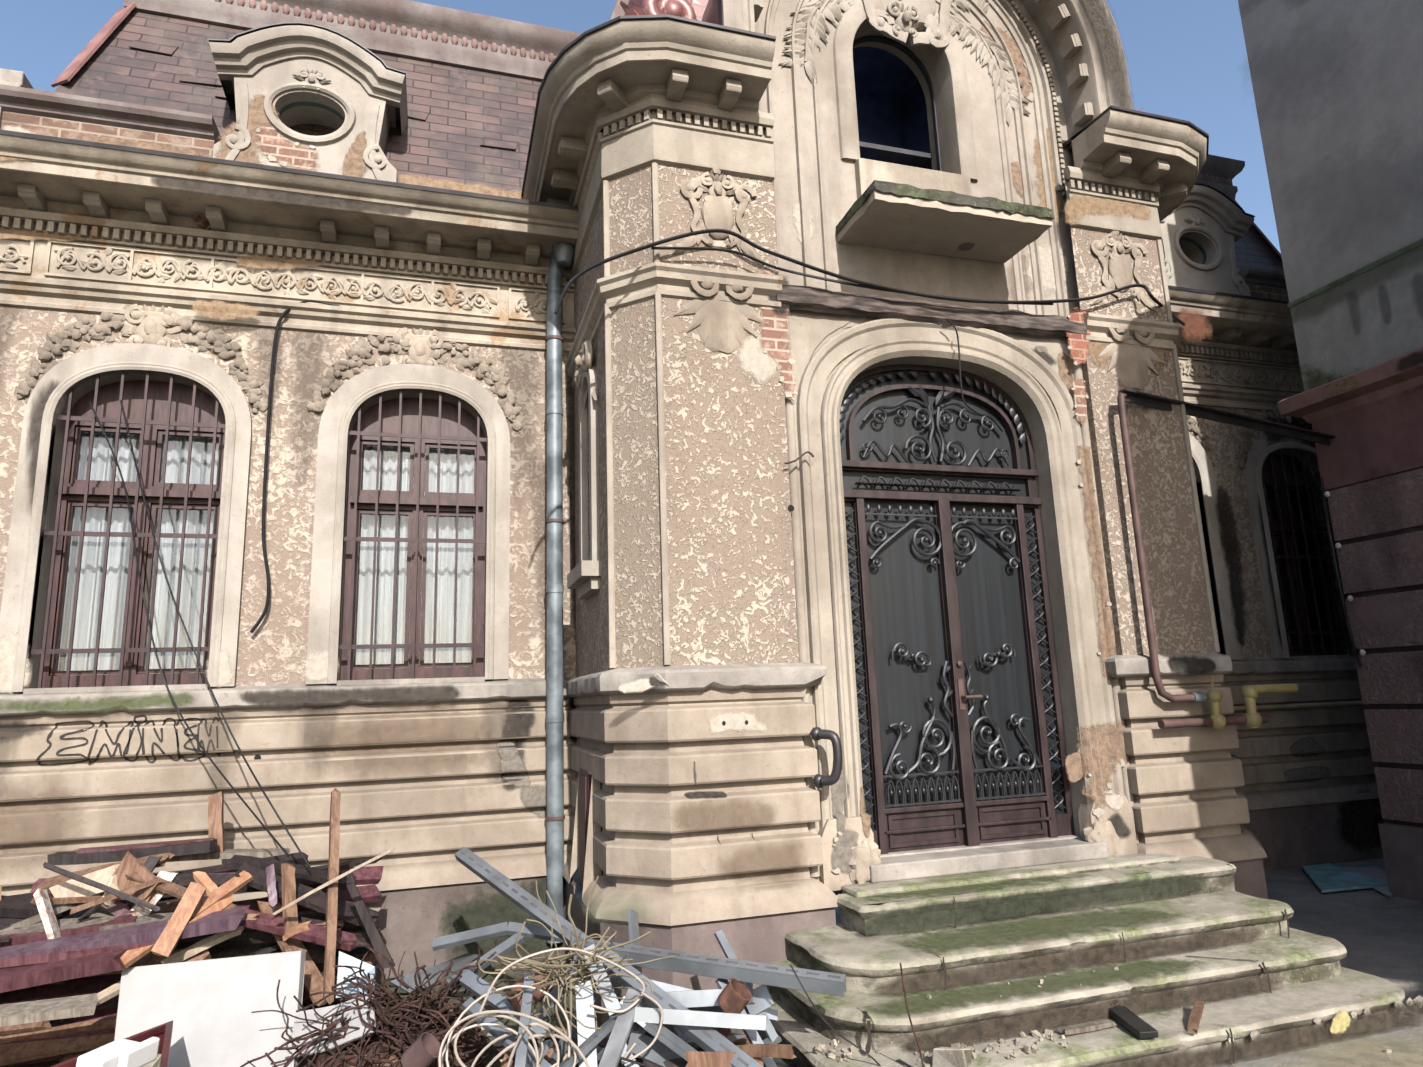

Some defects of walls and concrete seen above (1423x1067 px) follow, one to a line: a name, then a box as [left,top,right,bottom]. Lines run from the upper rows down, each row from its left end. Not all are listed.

flaking render [76,94,318,170]
peeling [1025,246,1071,295]
flaking render [738,307,798,400]
flaking render [1058,308,1113,423]
peeling [1076,445,1117,681]
peeling [831,769,871,874]
peeling [1066,722,1131,837]
water stain [1339,791,1384,852]